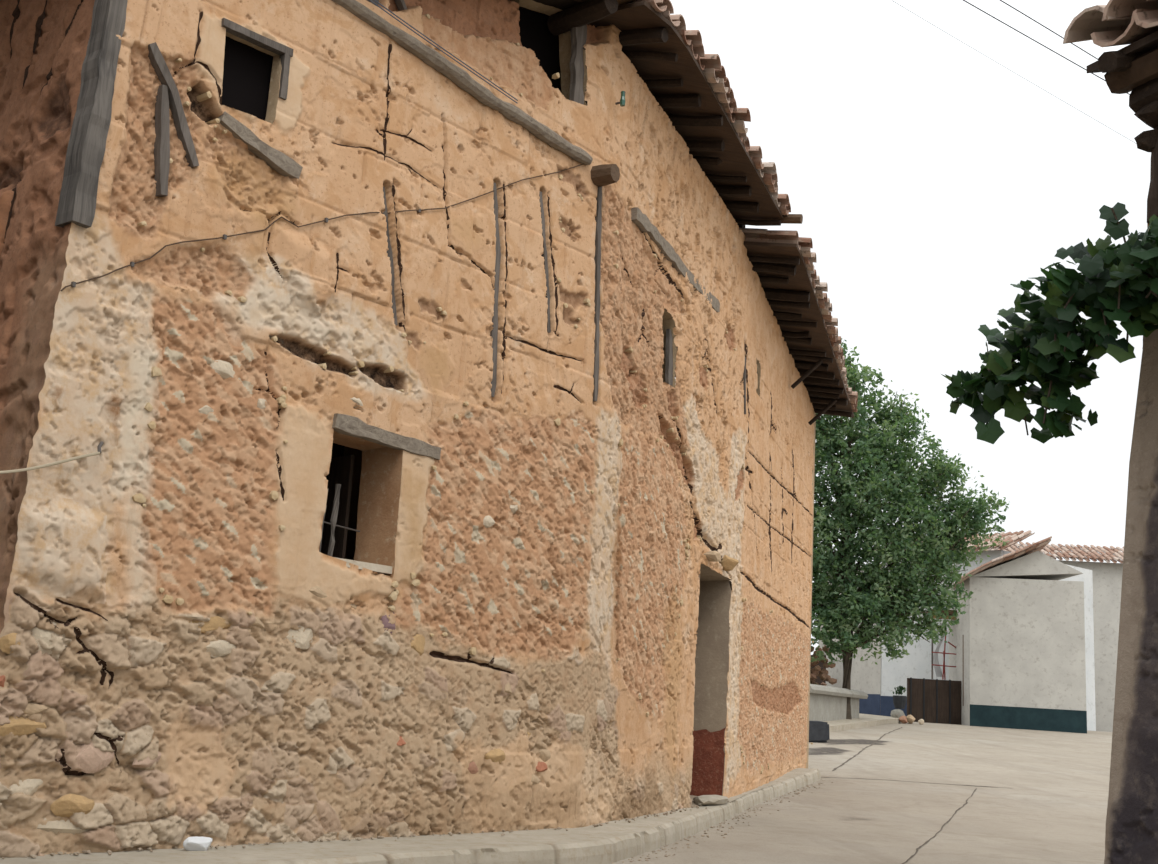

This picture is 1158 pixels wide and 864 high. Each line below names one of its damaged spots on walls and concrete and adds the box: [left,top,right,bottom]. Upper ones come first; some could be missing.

crack [10,0,83,95]
spalling [106,40,223,241]
crack [3,187,16,249]
spalling [396,328,426,352]
spalling [418,296,448,323]
flaking render [132,241,409,624]
crack [658,333,812,631]
spalling [734,463,745,503]
flaking render [609,341,704,723]
crack [14,592,114,687]
crack [429,651,512,674]